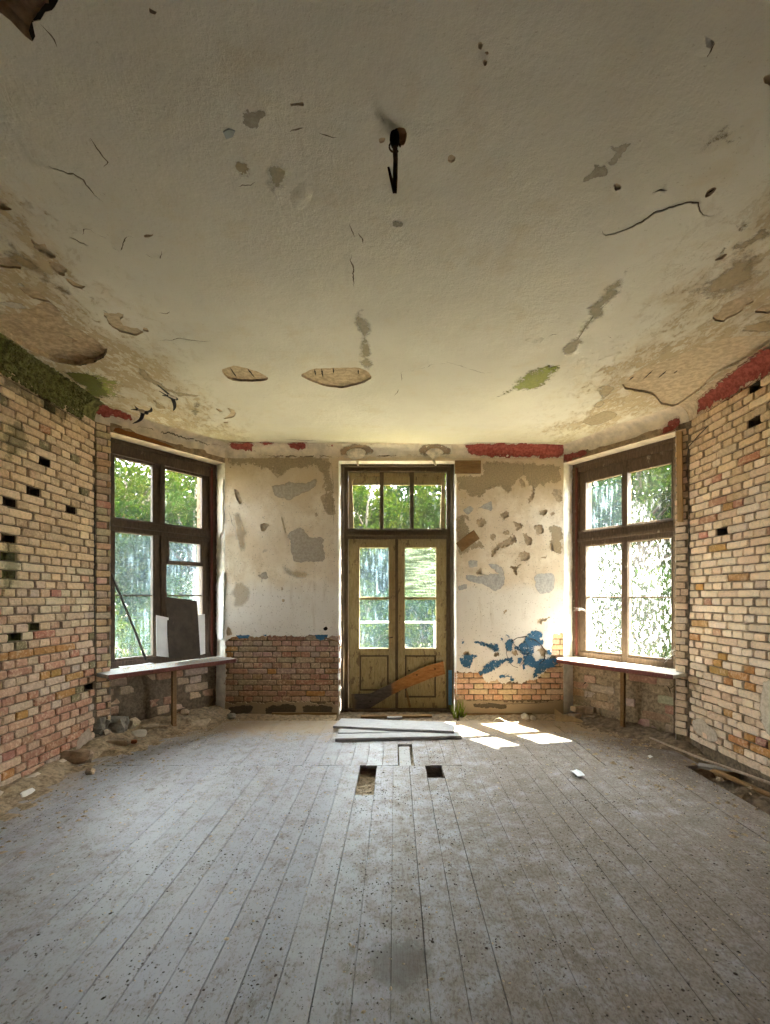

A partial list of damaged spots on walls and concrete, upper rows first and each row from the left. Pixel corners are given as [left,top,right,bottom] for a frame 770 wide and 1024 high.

crack [46,138,108,205]
crack [591,189,713,246]
flaking render [31,239,85,289]
flaking render [0,287,107,366]
peeling [96,404,132,421]
flaking render [583,336,770,437]
peeling [217,479,242,538]
peeling [228,442,591,594]
spalling [1,534,15,579]
spalling [6,623,39,642]
flaking render [216,570,341,707]
flaking render [454,617,563,704]